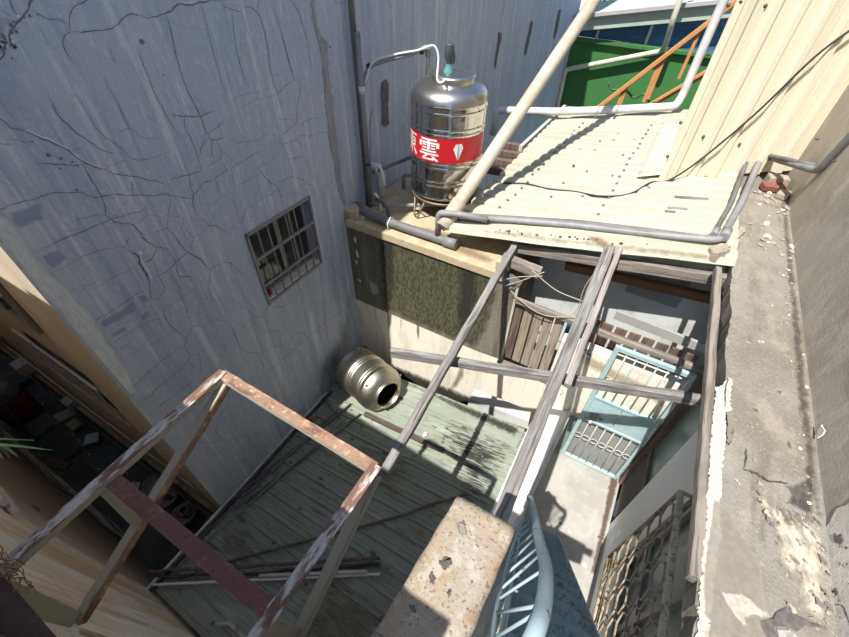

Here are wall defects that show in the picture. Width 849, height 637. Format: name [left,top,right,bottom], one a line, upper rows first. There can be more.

crack [0,0,352,412]
spalling [726,411,736,443]
spalling [439,556,452,570]
peeling [722,491,849,637]